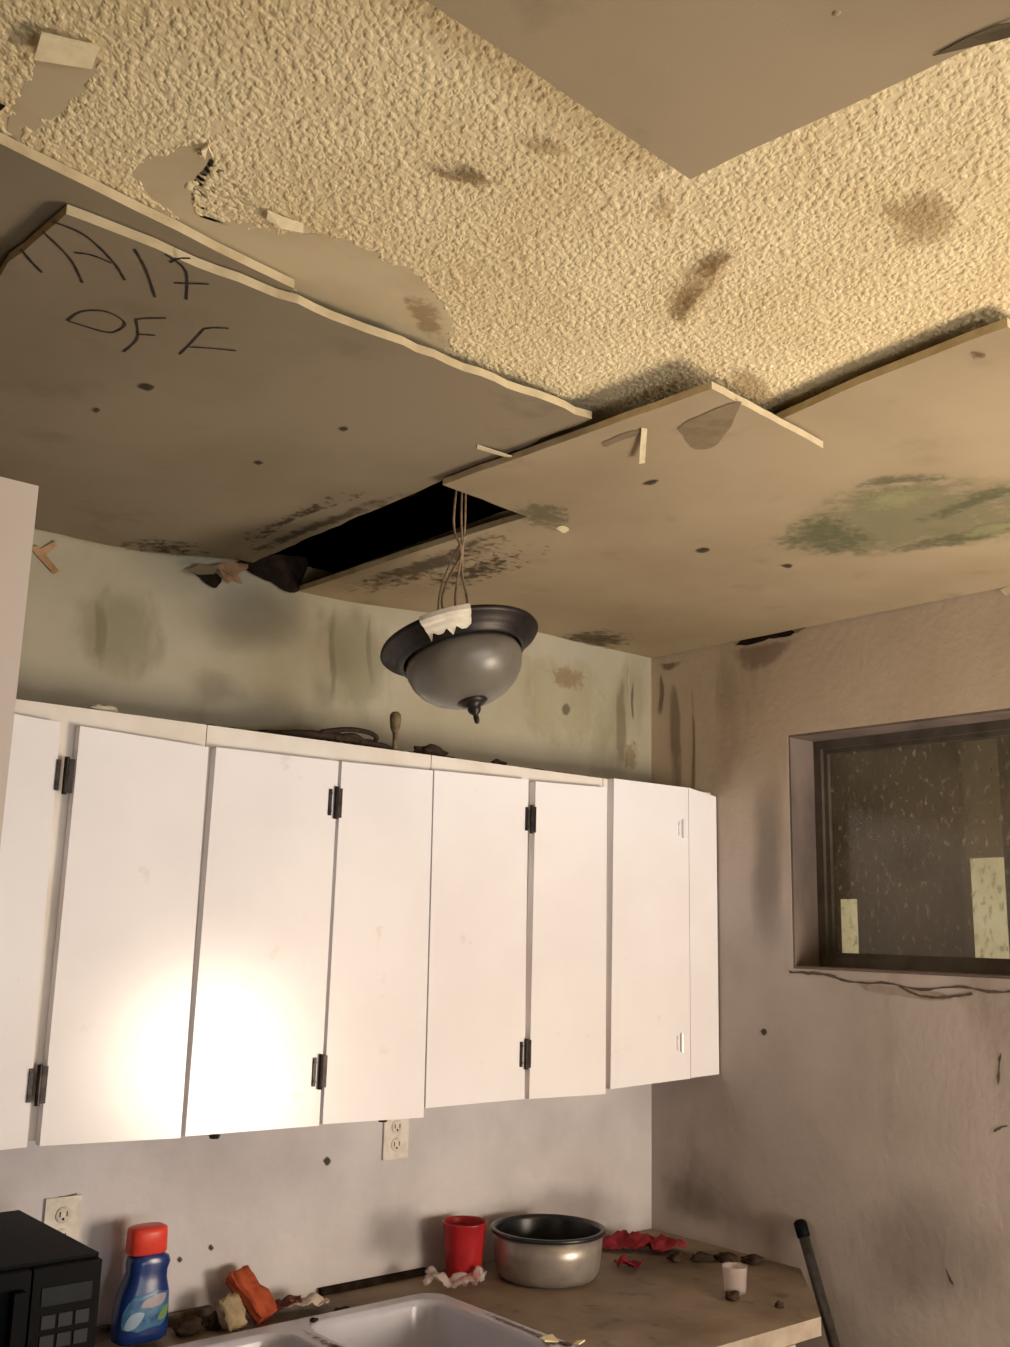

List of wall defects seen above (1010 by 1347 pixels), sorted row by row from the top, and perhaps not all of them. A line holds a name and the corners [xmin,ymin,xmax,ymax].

peeling [0,31,99,140]
crack [789,970,1010,1000]